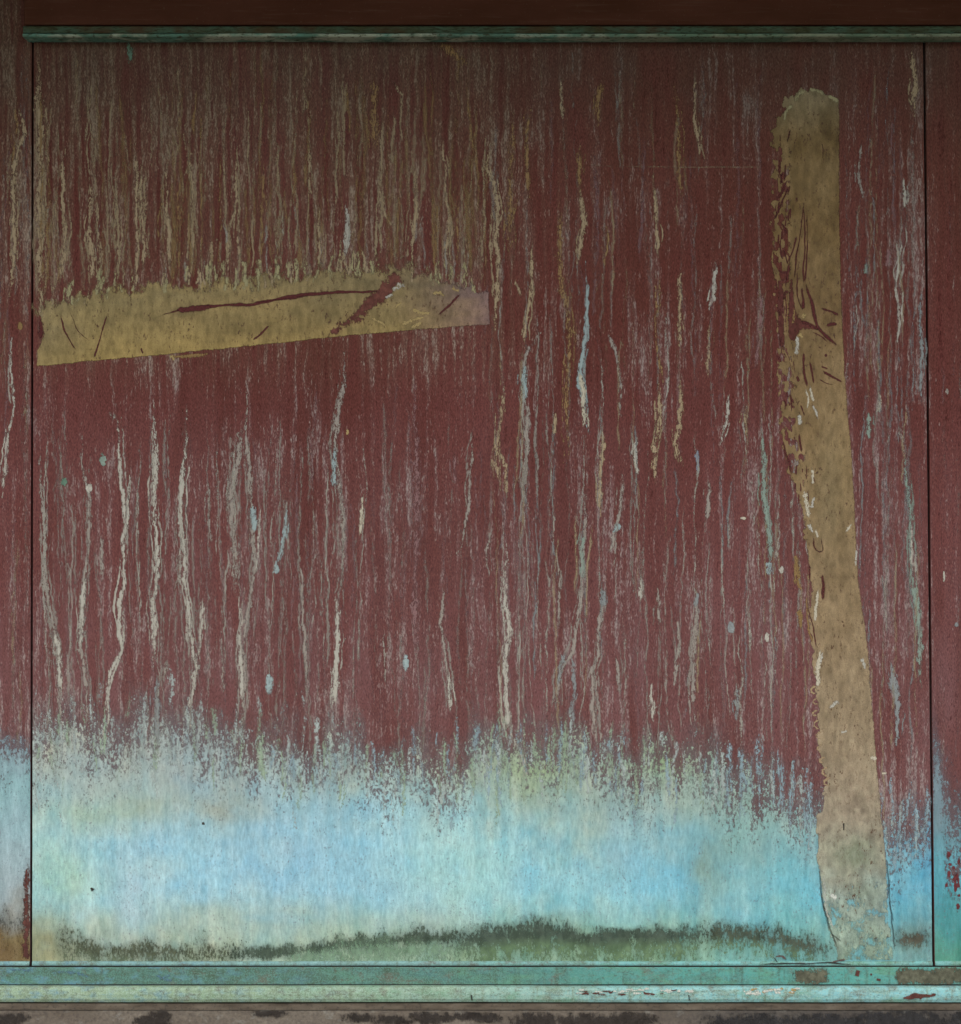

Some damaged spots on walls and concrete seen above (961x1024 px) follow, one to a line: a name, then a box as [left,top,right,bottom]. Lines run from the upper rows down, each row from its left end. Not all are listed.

water stain [674,76,705,196]
water stain [854,144,865,198]
water stain [653,175,663,258]
peeling [385,283,431,329]
peeling [786,293,806,354]
peeling [797,388,818,425]
peeling [803,470,818,538]
water stain [0,242,961,972]
peeling [779,555,823,688]
peeling [265,674,274,694]